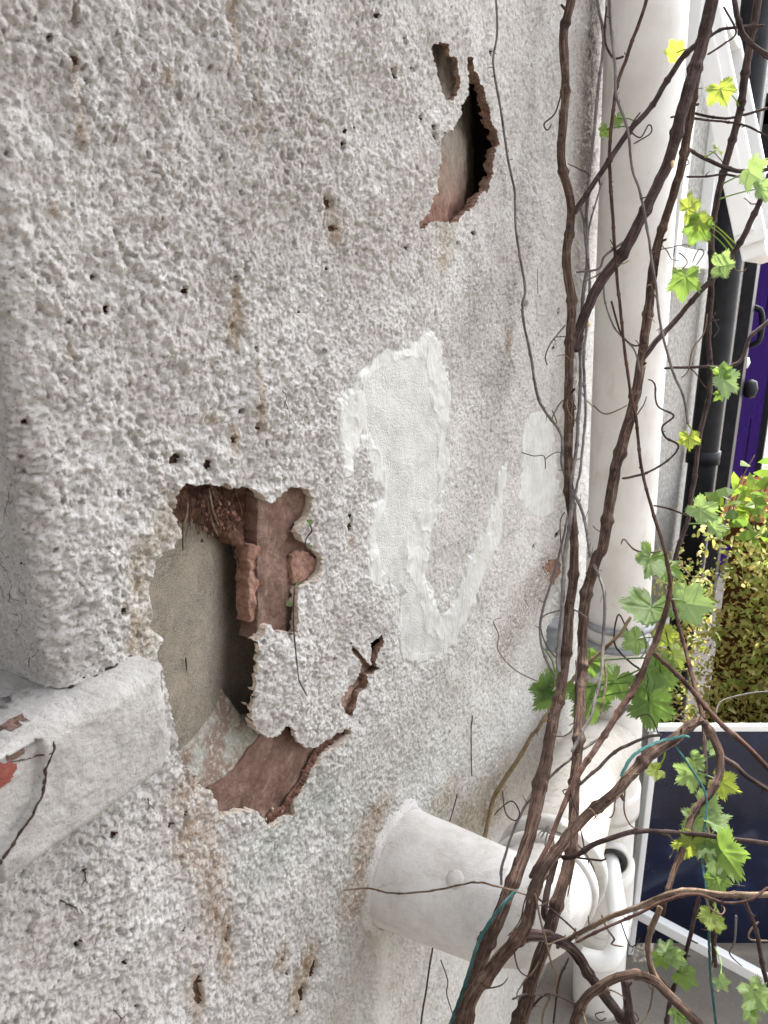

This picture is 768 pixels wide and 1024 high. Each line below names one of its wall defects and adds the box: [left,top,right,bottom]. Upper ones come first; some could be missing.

spalling [418,42,500,229]
peeling [0,747,25,788]
peeling [0,694,30,731]
crack [0,741,56,865]
spalling [149,483,352,828]
crack [341,635,384,717]